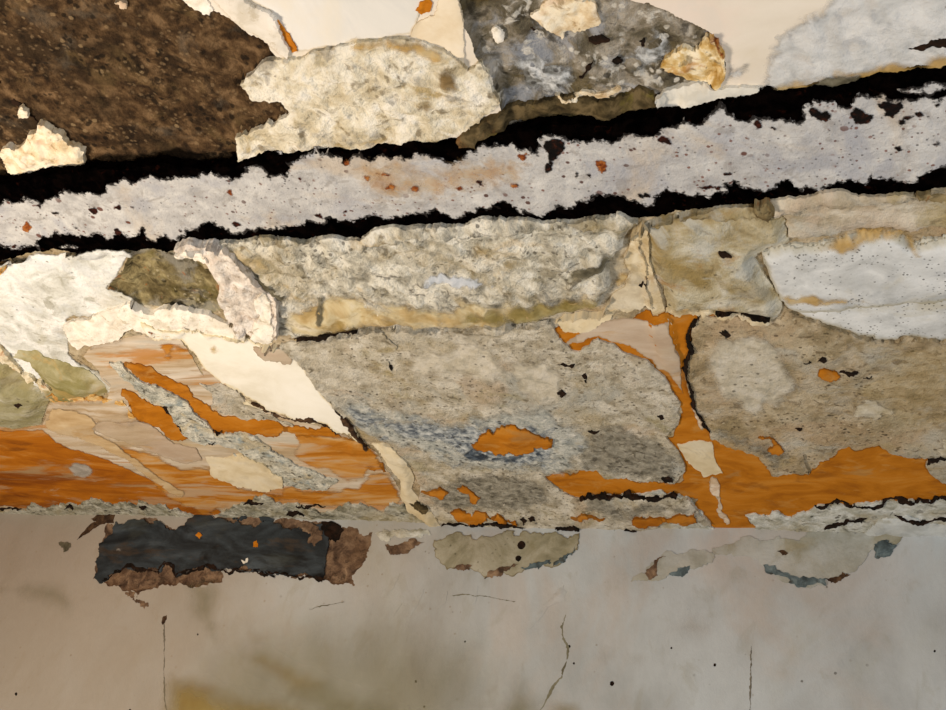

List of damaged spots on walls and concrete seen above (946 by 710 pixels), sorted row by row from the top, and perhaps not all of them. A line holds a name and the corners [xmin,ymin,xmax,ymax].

spalling [0,0,760,177]
peeling [897,81,946,98]
spalling [0,187,946,596]
crack [125,591,167,710]
crack [540,615,569,710]